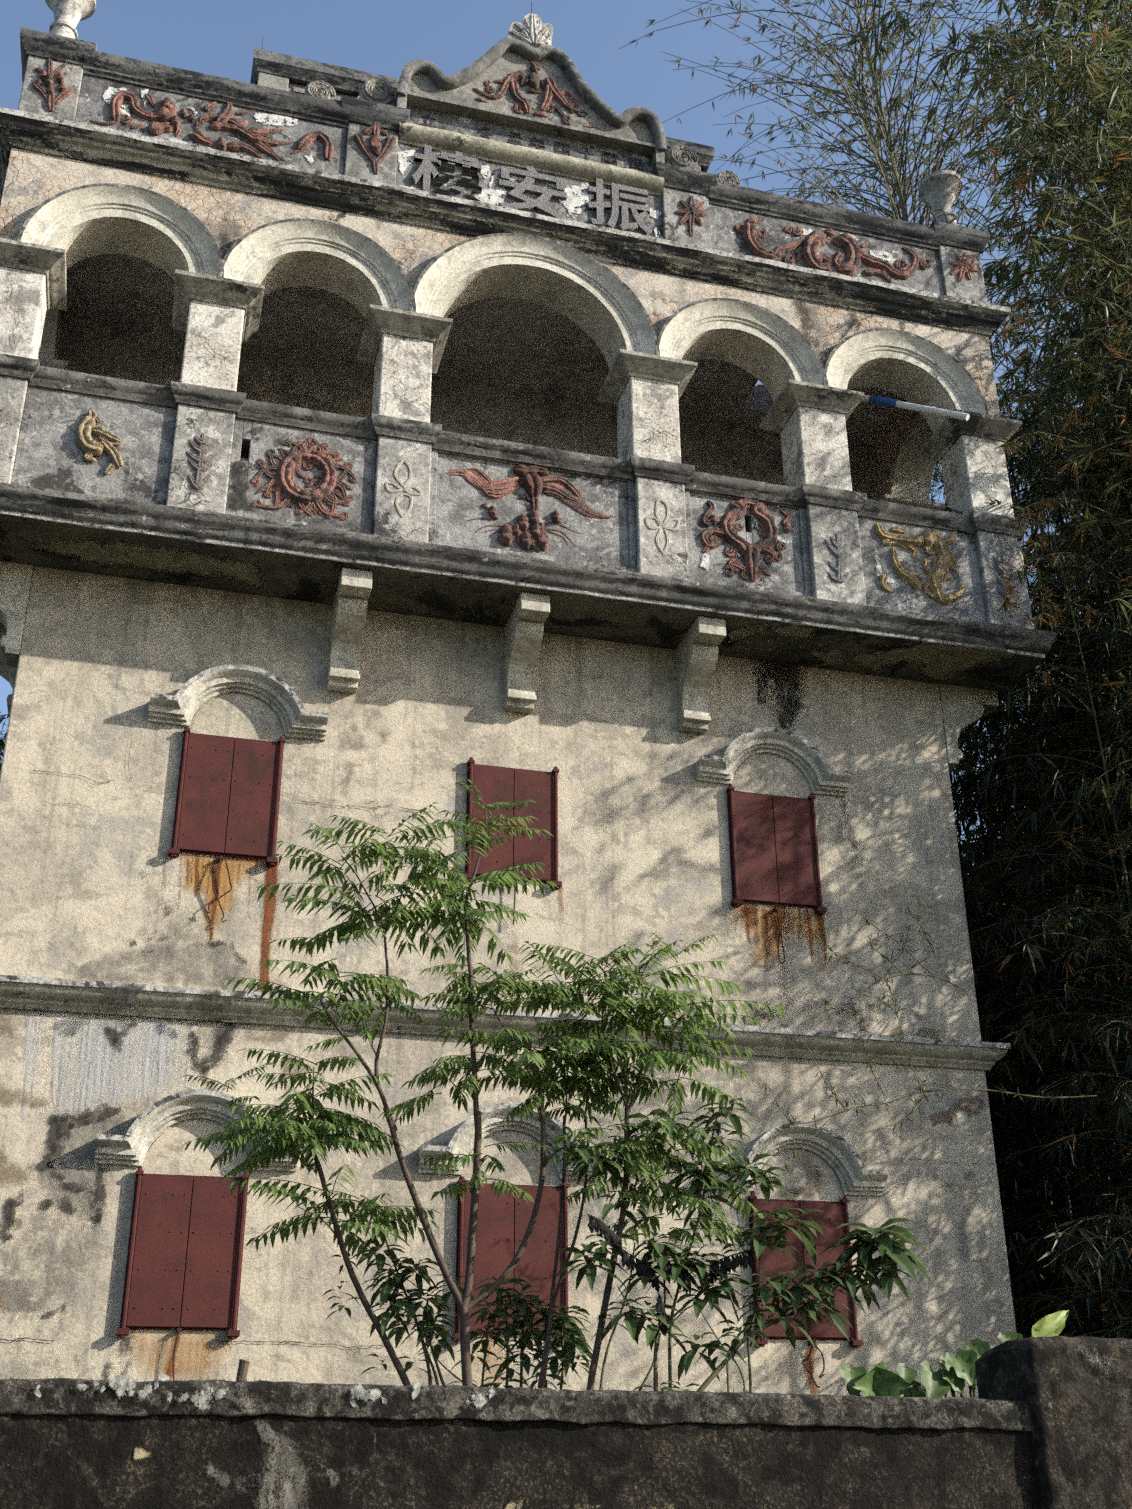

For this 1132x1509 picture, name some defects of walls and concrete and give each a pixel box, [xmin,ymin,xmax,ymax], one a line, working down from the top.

water stain [752,660,807,729]
corrosion [179,854,278,991]
corrosion [737,903,827,965]
water stain [0,888,251,1320]
water stain [102,1329,135,1380]
corrosion [144,1328,208,1380]
corrosion [805,1341,819,1394]